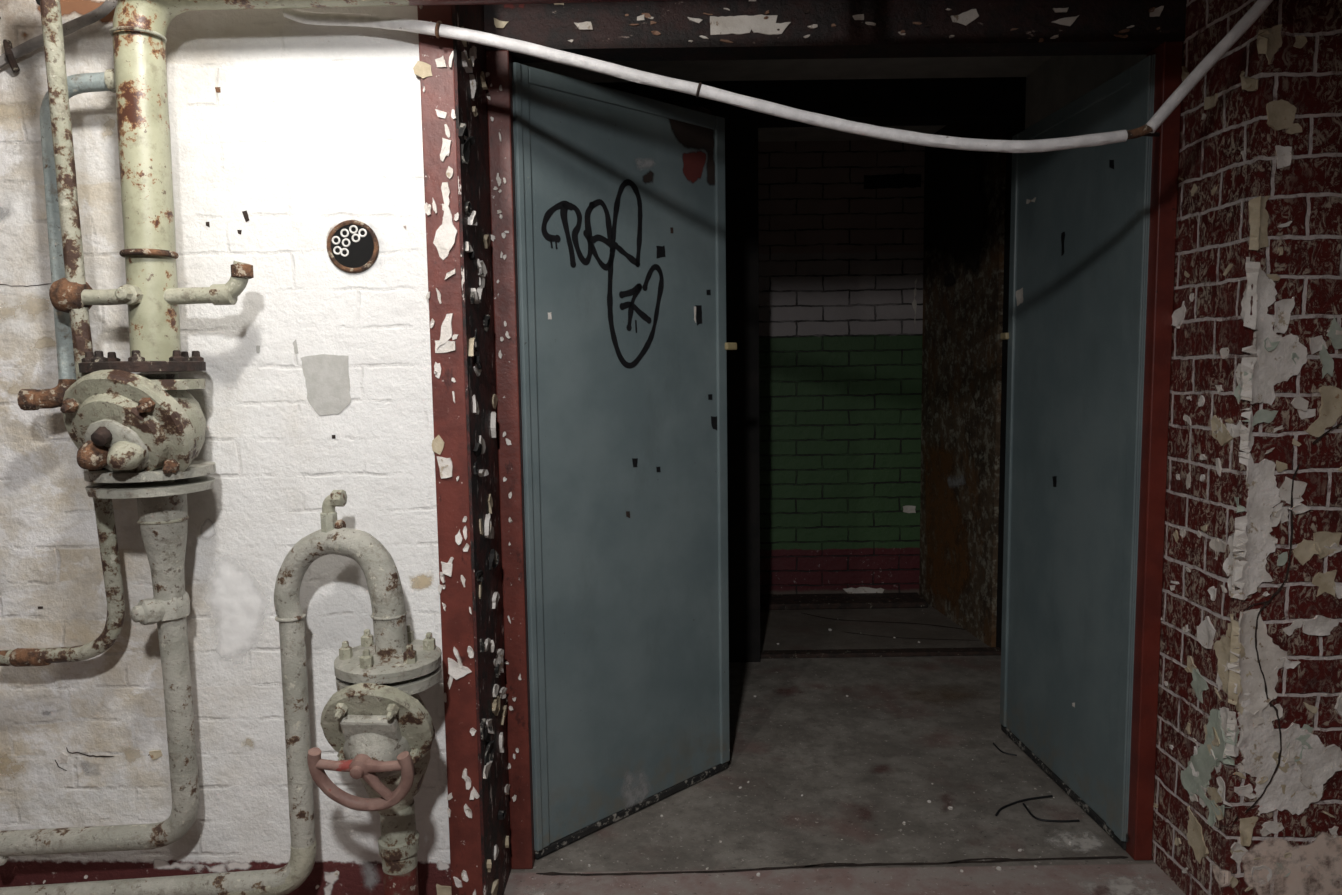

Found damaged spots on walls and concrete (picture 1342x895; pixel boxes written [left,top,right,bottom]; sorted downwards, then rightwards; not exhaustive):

peeling [494,4,525,29]
peeling [567,21,593,43]
peeling [687,0,836,43]
peeling [898,8,979,38]
peeling [1266,99,1302,169]
peeling [413,27,510,403]
peeling [432,394,512,498]
peeling [412,494,511,624]
peeling [443,638,522,820]
peeling [154,859,250,873]
peeling [316,871,339,895]
peeling [436,836,509,895]